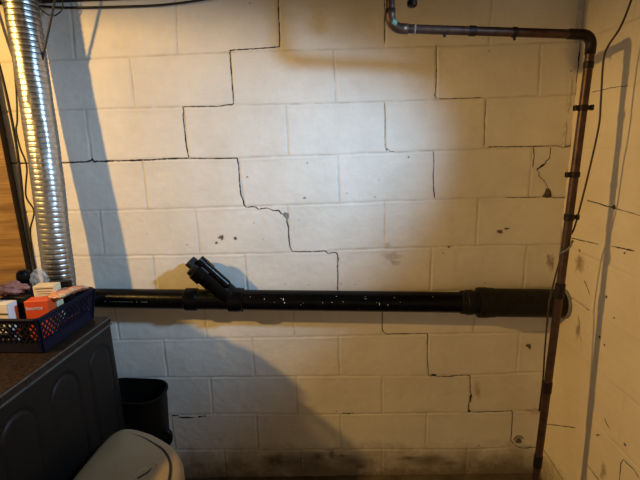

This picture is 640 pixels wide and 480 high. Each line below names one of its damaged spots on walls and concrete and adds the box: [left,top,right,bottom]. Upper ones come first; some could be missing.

crack [62,0,339,290]
crack [434,47,571,198]
crack [382,316,563,480]